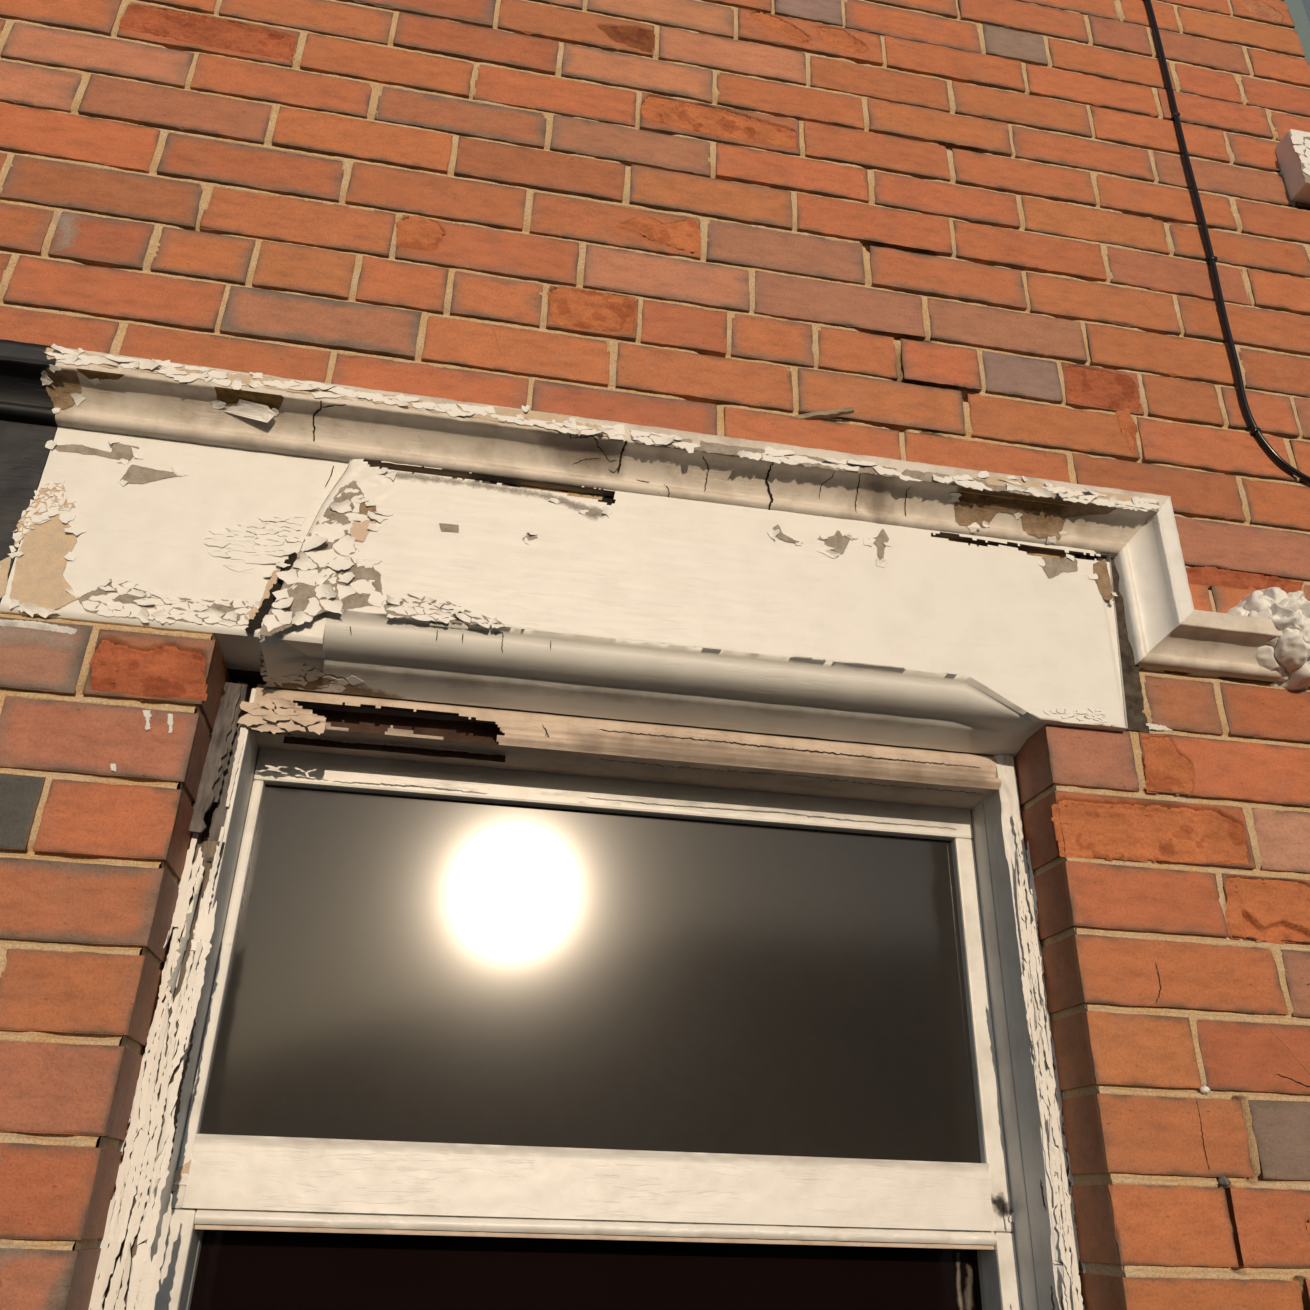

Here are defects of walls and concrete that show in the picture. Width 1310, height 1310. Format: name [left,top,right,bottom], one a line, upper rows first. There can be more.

spalling [119,5,295,61]
spalling [640,97,797,149]
spalling [395,216,444,252]
spalling [547,286,635,335]
peeling [40,344,1162,605]
crack [570,434,670,497]
crack [765,462,774,510]
crack [819,473,861,511]
peeling [8,481,505,735]
crack [245,552,297,634]
spalling [1051,737,1310,944]
peeling [88,836,223,1310]